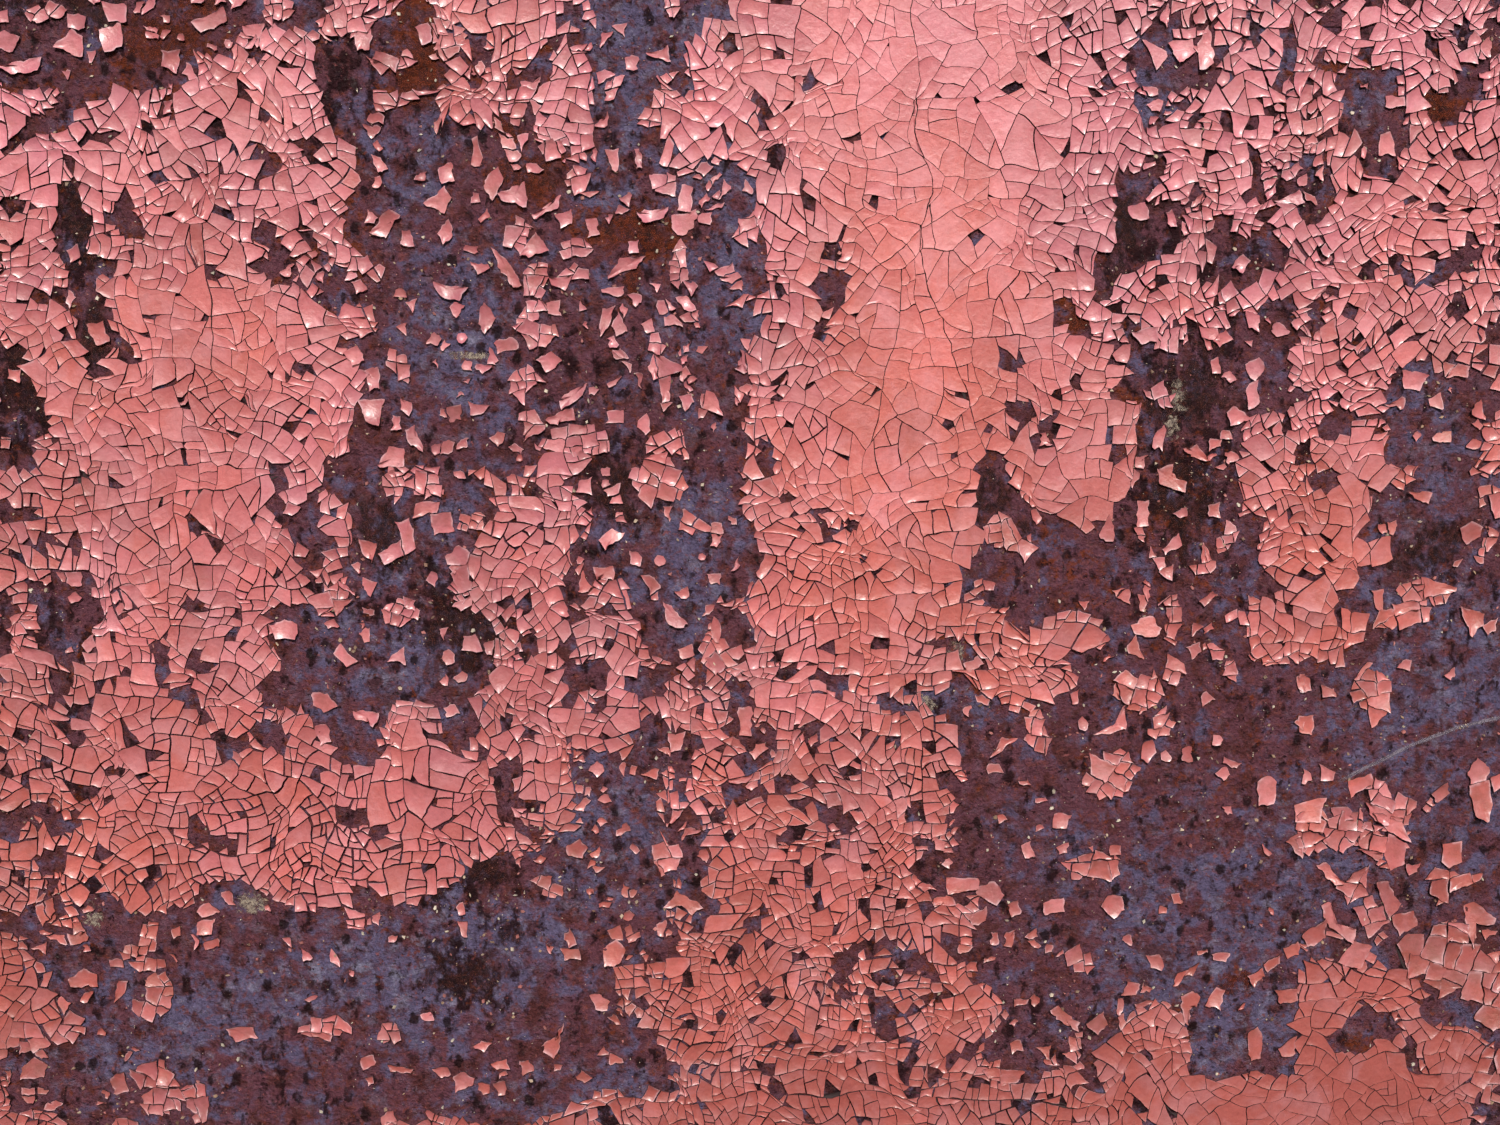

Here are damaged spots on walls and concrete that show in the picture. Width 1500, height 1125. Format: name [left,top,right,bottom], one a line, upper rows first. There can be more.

corrosion [54,0,220,75]
corrosion [390,4,446,107]
crack [838,0,974,484]
crack [206,303,255,412]
crack [71,443,278,566]
corrosion [581,437,672,531]
peeling [793,495,846,560]
peeling [803,0,1500,1125]
corrosion [1142,457,1217,565]
corrosion [407,590,522,707]
crack [1383,904,1406,969]
crack [820,1089,1073,1109]